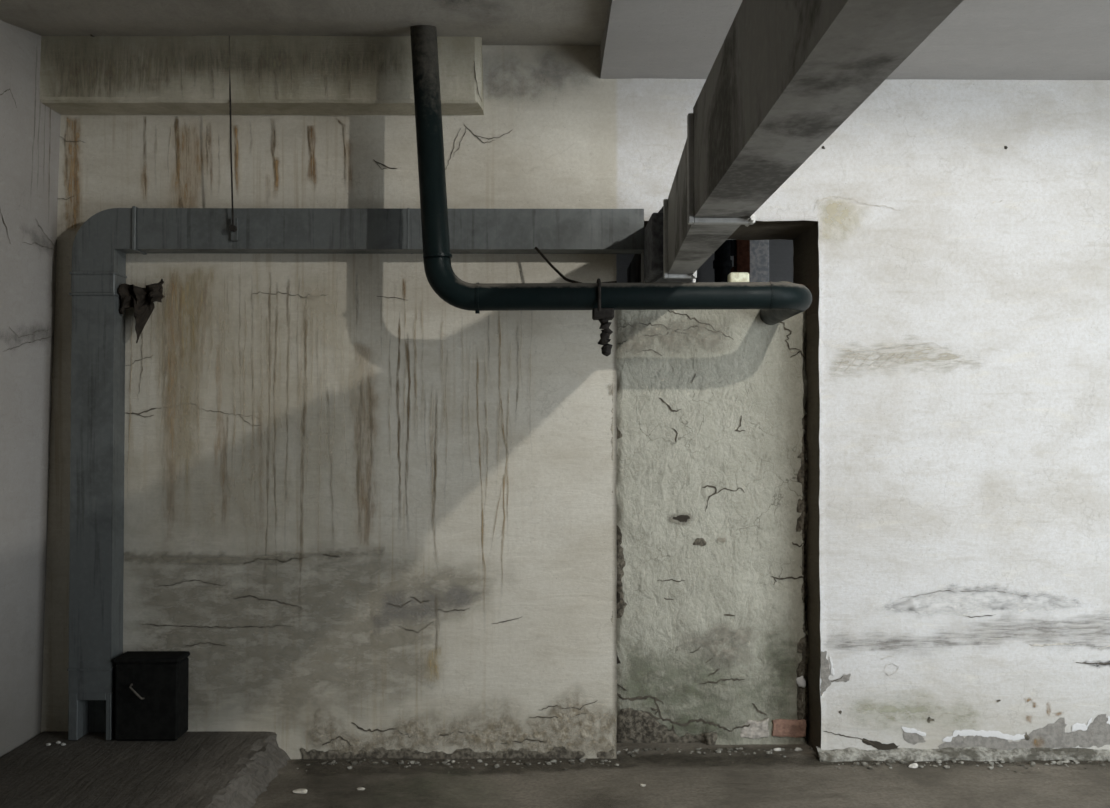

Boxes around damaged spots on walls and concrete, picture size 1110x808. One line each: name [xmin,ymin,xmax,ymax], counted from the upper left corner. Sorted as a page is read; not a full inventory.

rust [57,118,83,228]
rust [169,118,212,207]
rust [271,131,279,187]
leakage [389,323,416,490]
crack [660,398,681,441]
leakage [125,395,478,710]
leakage [481,459,508,562]
spalling [611,526,627,622]
crack [703,485,745,512]
spalling [300,701,718,760]
crack [617,669,766,732]
peeling [902,714,1110,750]